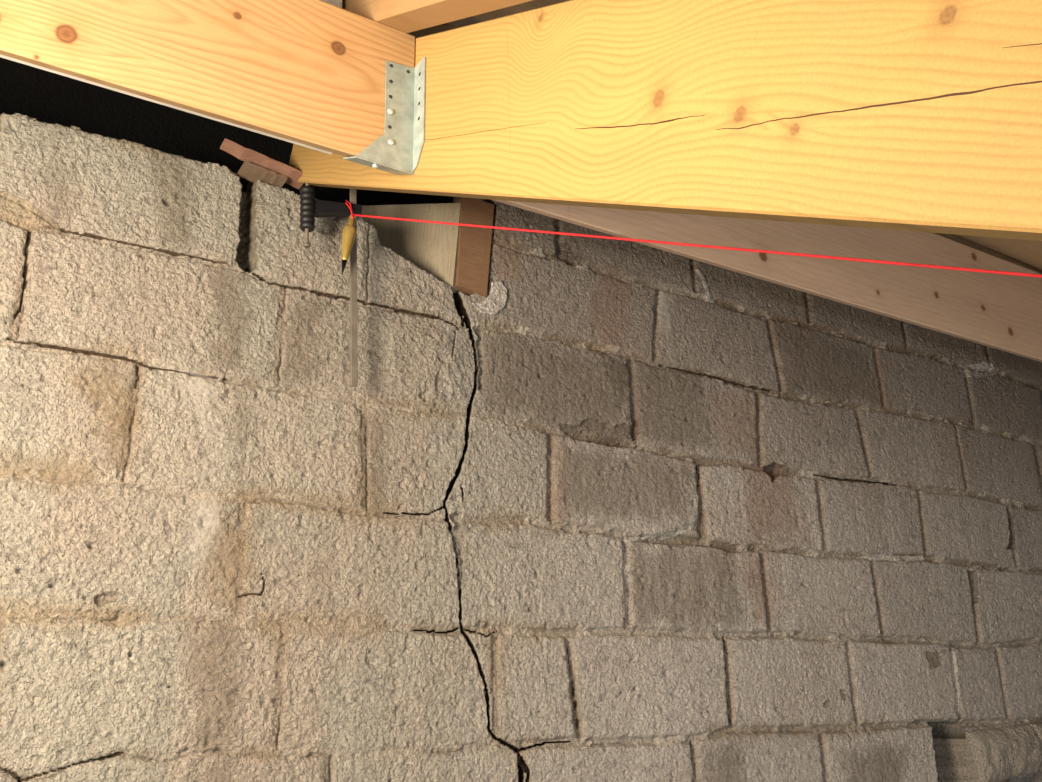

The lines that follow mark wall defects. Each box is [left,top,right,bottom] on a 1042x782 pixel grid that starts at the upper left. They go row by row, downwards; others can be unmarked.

crack [575,81,1042,130]
crack [426,122,546,140]
spalling [236,176,257,273]
crack [6,228,228,389]
crack [252,273,579,782]
crack [238,573,265,598]
crack [0,751,124,782]